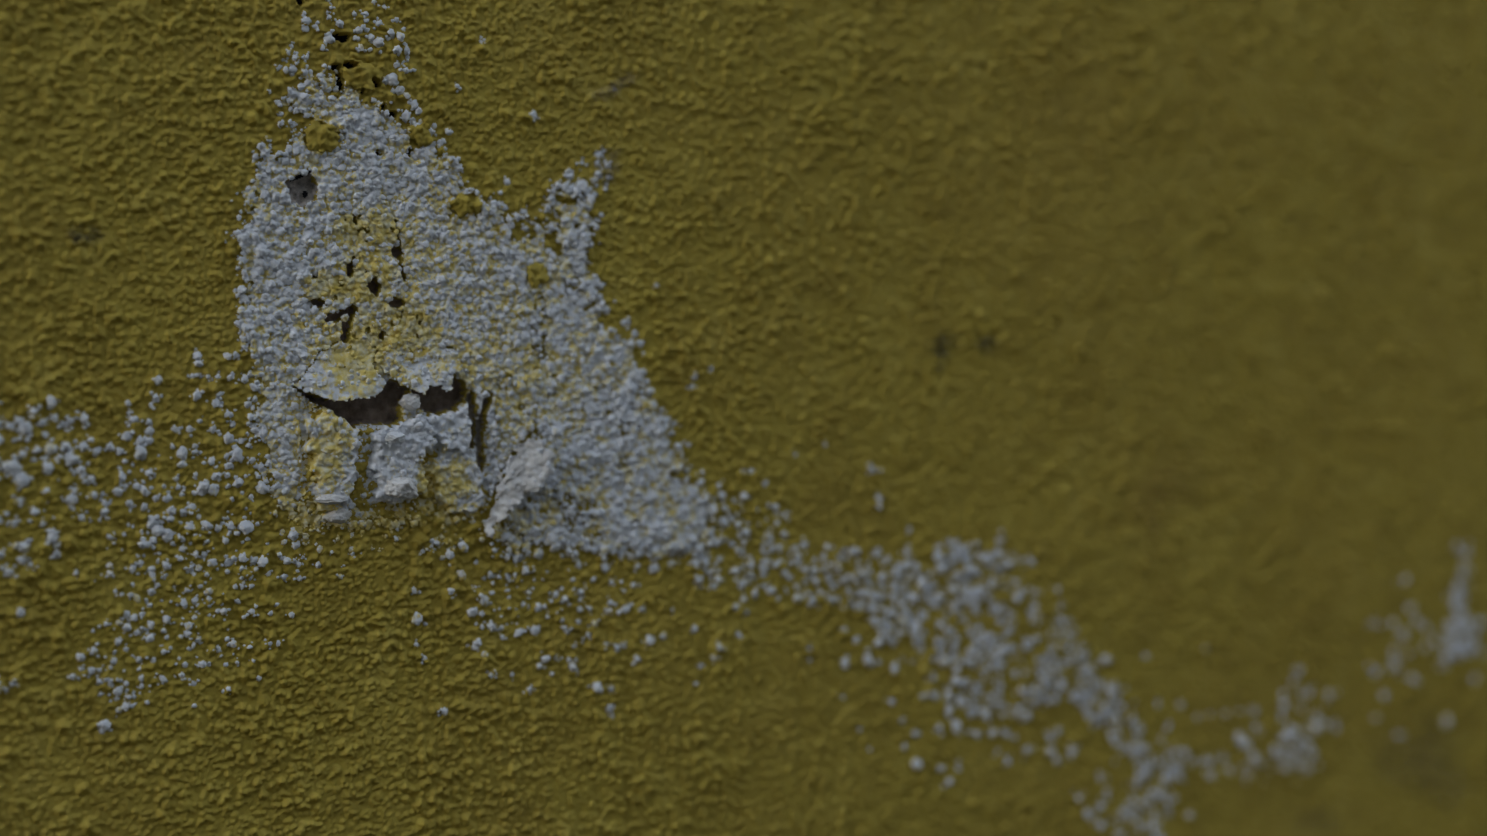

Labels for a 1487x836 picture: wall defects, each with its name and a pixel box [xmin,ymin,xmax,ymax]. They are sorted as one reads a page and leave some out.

damp [301,0,344,51]
spalling [331,62,353,91]
spalling [366,278,403,307]
damp [149,375,163,410]
flaking render [294,300,556,538]
damp [170,9,1232,836]
damp [0,395,307,717]
damp [96,719,113,734]
damp [1195,667,1339,784]